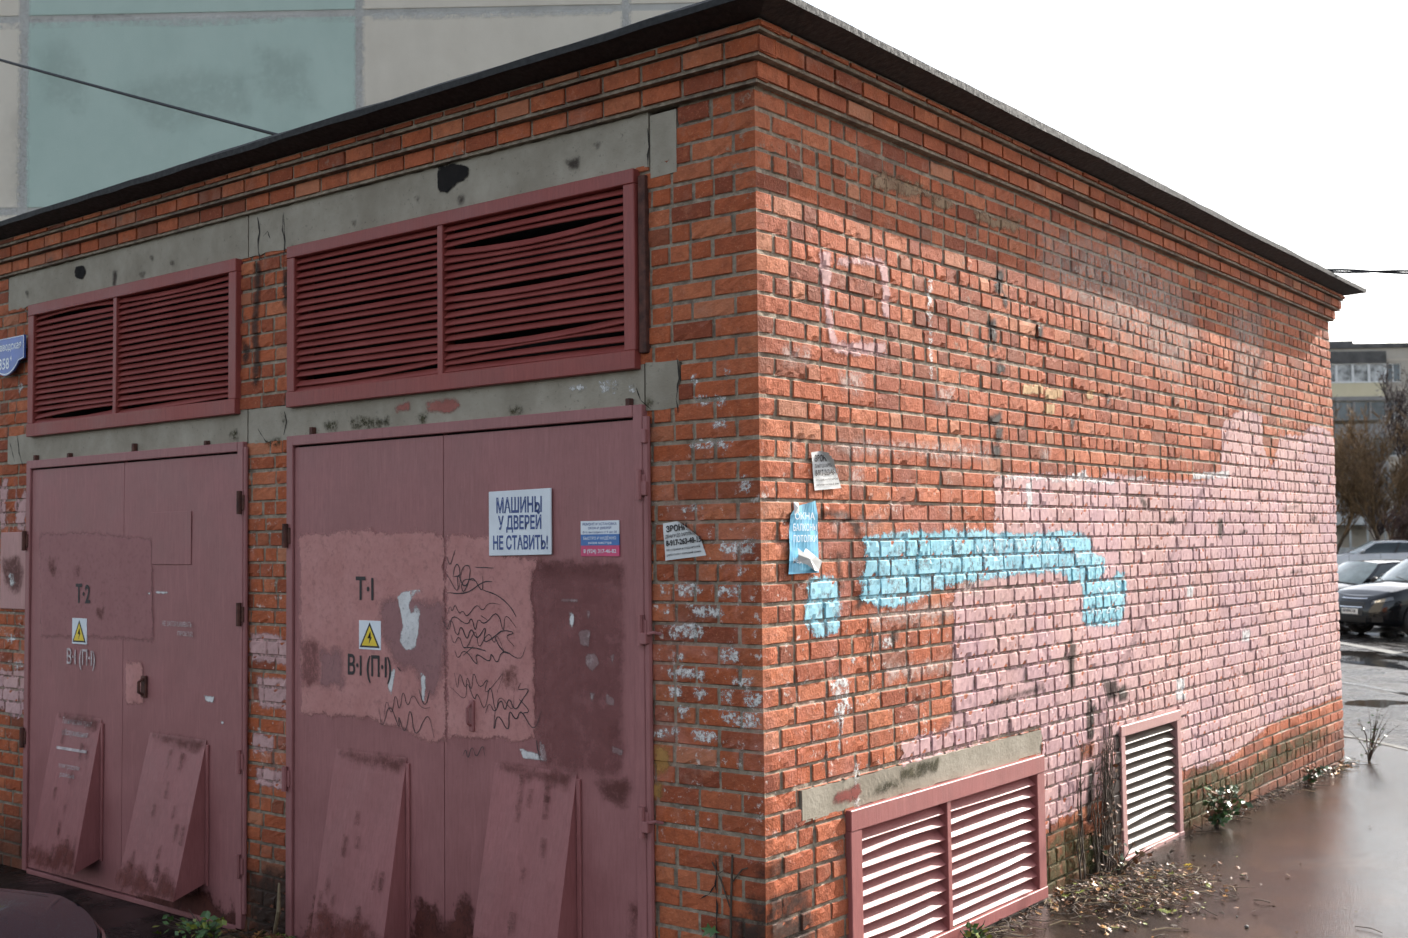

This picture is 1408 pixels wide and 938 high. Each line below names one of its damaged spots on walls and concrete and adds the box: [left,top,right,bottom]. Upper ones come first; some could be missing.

peeling [398,590,420,650]
leakage [1087,732,1122,877]
corrosion [410,893,473,938]